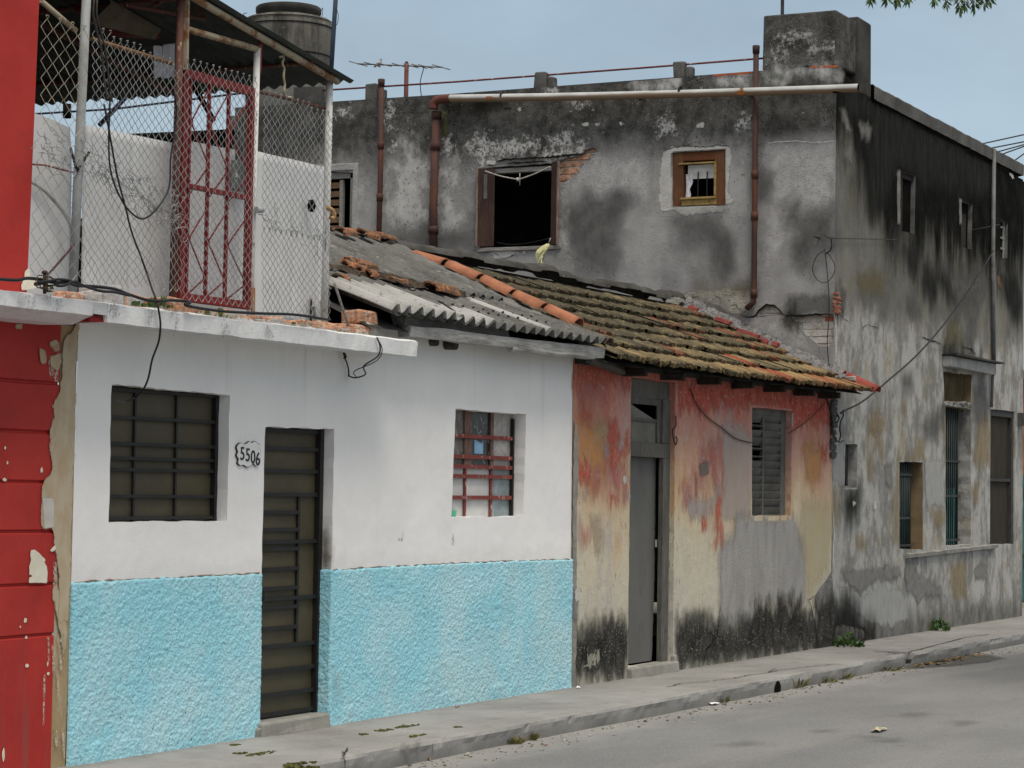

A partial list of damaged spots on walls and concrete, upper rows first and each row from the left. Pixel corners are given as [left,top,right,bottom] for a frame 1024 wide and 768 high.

flaking render [560,149,657,207]
leakage [840,92,992,221]
leakage [567,195,621,267]
crack [693,294,878,329]
leakage [905,247,984,356]
leakage [1001,266,1022,322]
peeling [29,323,79,660]
peeling [577,407,631,504]
leakage [575,613,628,683]
leakage [676,598,817,670]